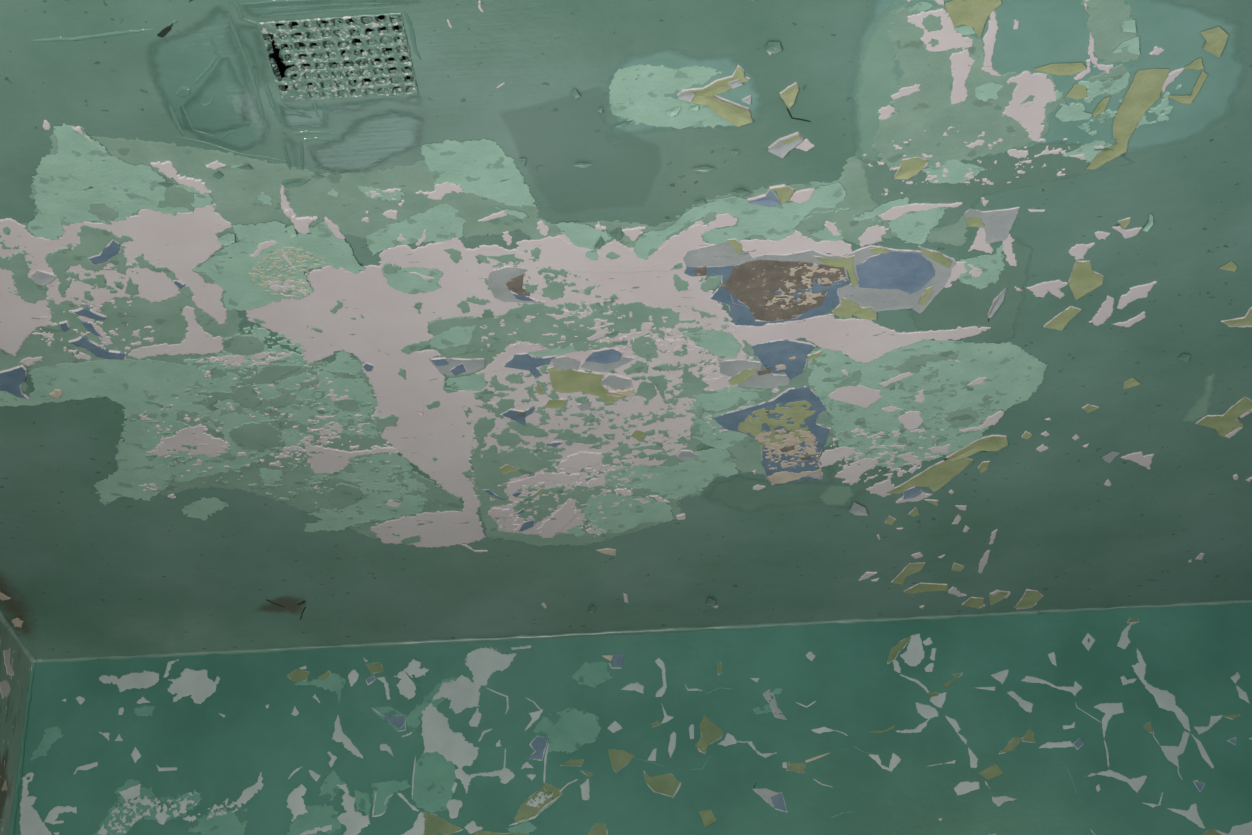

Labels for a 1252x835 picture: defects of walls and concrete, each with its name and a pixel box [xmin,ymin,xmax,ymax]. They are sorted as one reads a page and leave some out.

peeling [0,0,1229,556]
peeling [1221,307,1252,328]
peeling [1184,375,1252,439]
peeling [99,659,220,716]
peeling [2,726,77,835]
peeling [74,762,98,775]
peeling [99,731,141,763]
peeling [287,645,622,835]
peeling [572,653,832,798]
peeling [753,788,787,812]
peeling [811,727,847,736]
peeling [869,617,1252,835]